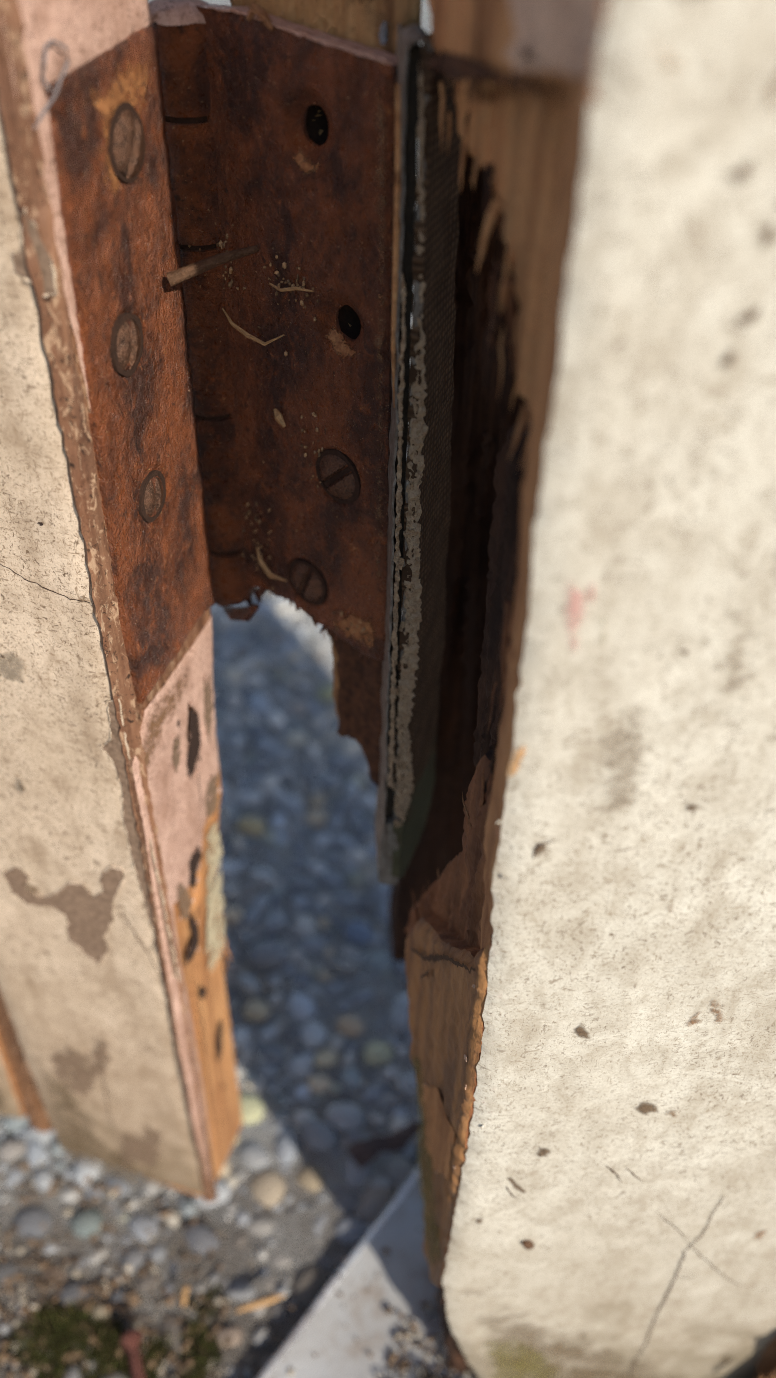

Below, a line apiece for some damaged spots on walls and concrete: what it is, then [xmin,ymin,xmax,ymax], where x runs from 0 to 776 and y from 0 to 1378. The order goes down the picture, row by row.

rust [87,59,152,193]
rust [293,149,319,173]
rust [327,327,356,357]
rust [223,604,259,621]
spalling [0,587,467,1378]
crack [621,1196,770,1378]